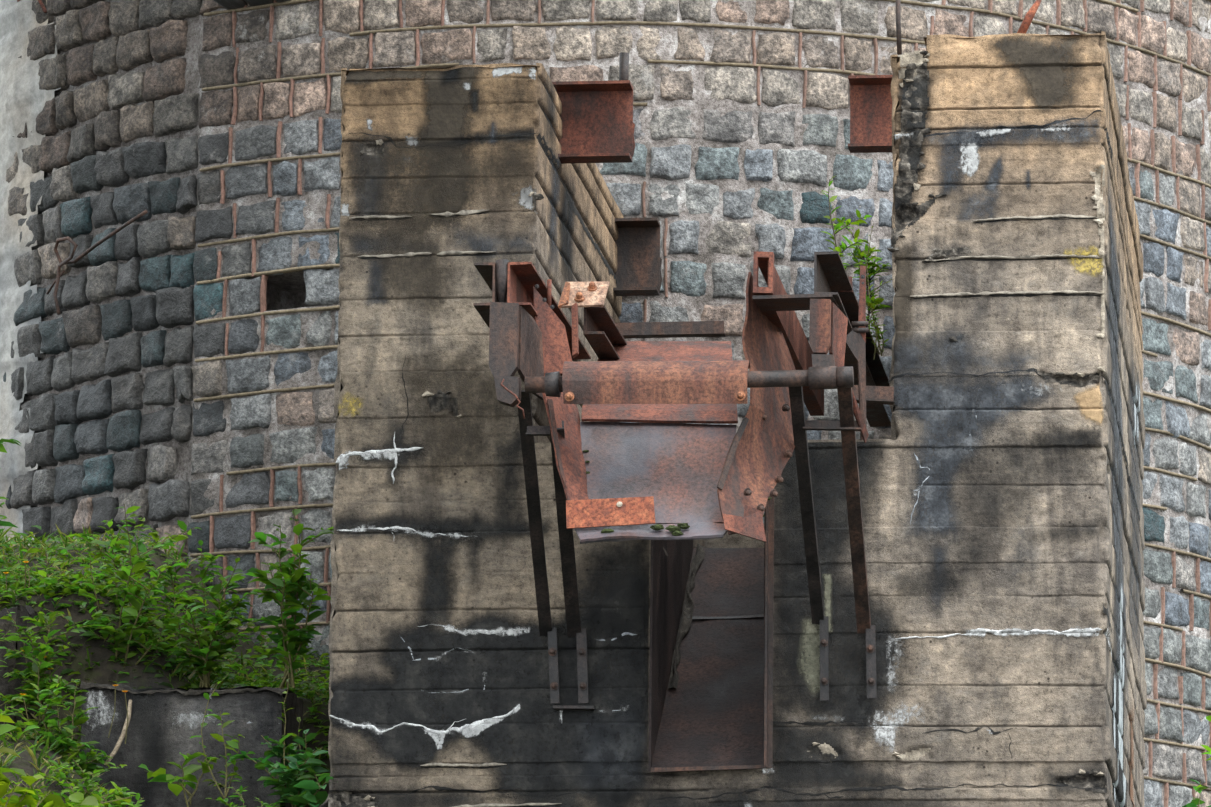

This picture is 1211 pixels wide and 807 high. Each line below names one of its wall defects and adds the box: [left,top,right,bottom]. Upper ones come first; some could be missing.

spalling [887,50,947,252]
crack [336,356,422,484]
crack [340,525,478,538]
crack [402,624,530,661]
crack [898,605,1112,653]
crack [329,685,520,749]